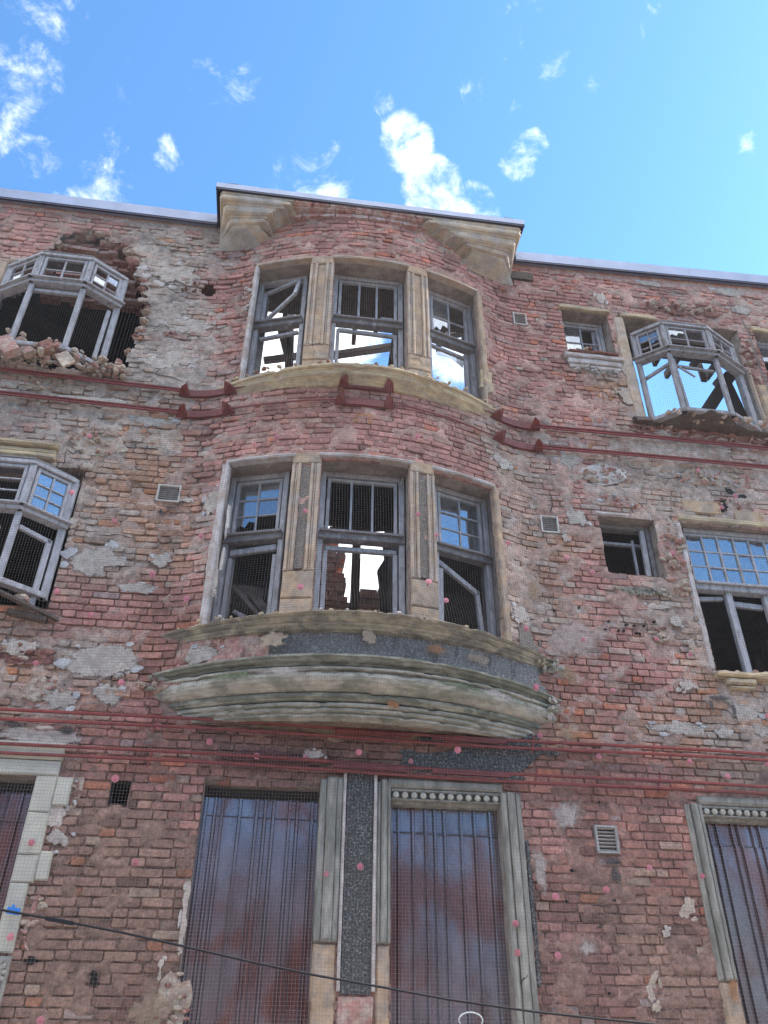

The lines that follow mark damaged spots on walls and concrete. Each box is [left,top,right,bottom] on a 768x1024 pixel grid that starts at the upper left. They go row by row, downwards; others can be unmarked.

spalling [39,225,216,370]
flaking render [60,540,129,577]
flaking render [150,553,172,568]
flaking render [258,631,288,646]
flaking render [362,630,377,644]
flaking render [0,638,168,711]
flaking render [646,704,768,738]
flaking render [679,897,698,922]
spalling [154,877,192,1024]